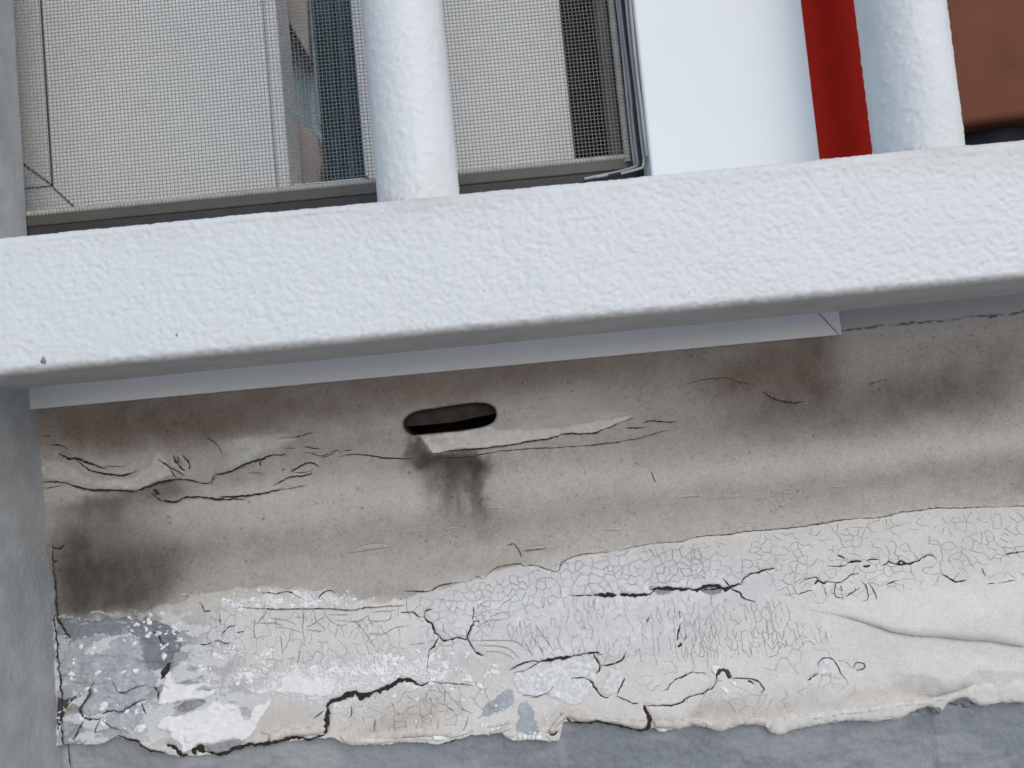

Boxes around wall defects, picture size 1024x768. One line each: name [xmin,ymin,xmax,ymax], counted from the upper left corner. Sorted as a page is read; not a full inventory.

crack [43,417,675,503]
water stain [413,439,487,496]
peeling [421,413,631,453]
spalling [52,616,181,737]
water stain [61,536,757,753]
crack [52,512,1024,768]
peeling [261,725,325,742]
peeling [340,727,474,745]